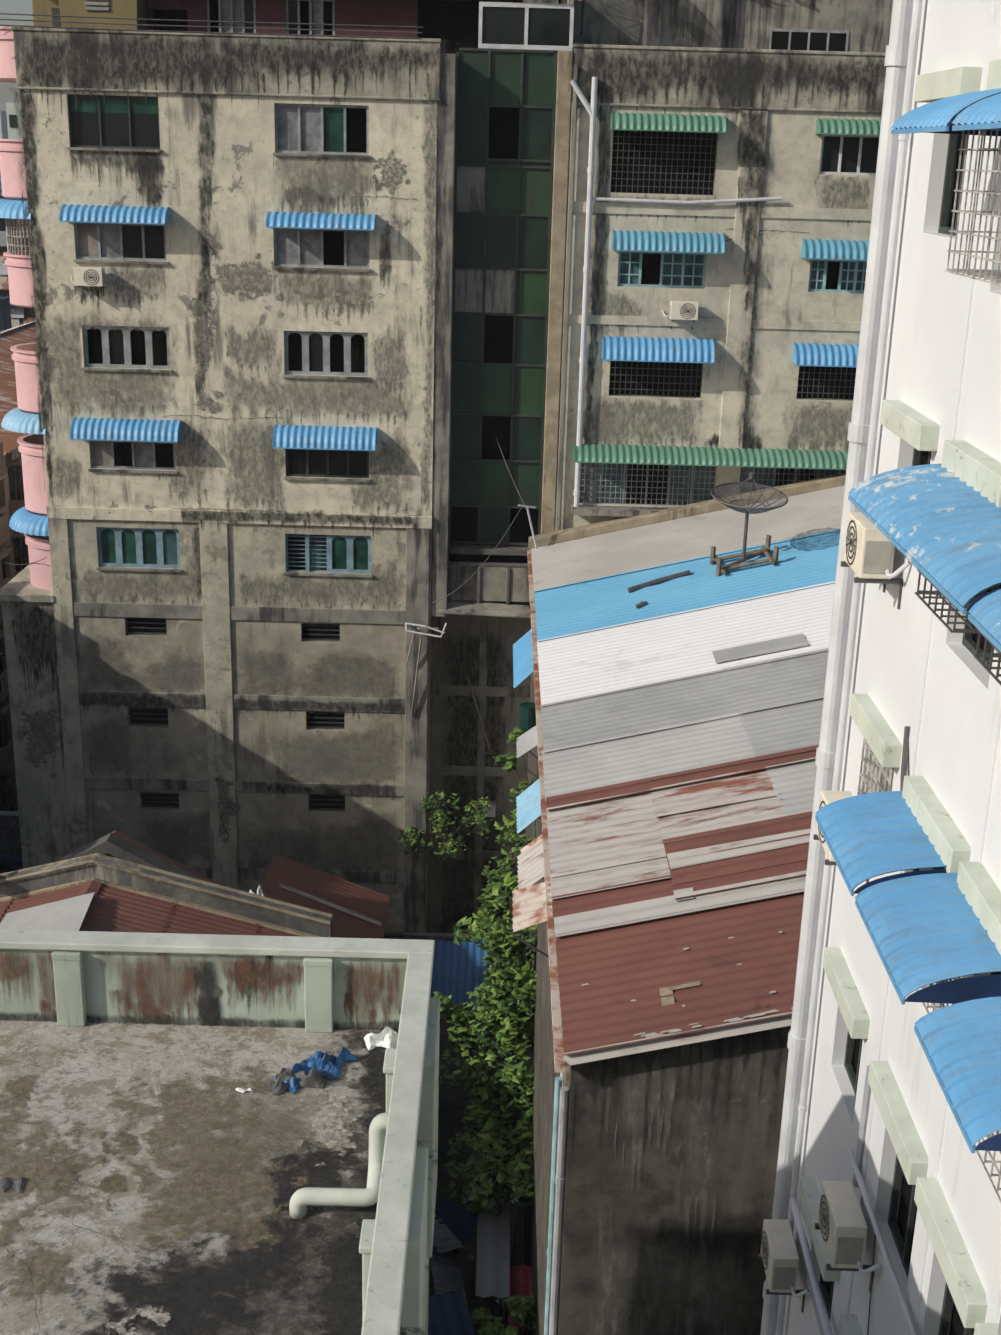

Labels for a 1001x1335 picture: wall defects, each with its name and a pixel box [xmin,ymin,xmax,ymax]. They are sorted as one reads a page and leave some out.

leakage [15,34,449,609]
leakage [577,51,886,451]
leakage [12,603,64,762]
leakage [79,639,206,711]
leakage [233,654,402,802]
corrosion [0,952,57,1021]
leakage [0,1013,57,1022]
corrosion [116,955,205,1024]
corrosion [223,957,303,1008]
corrosion [333,963,401,1029]
leakage [71,1021,400,1335]
leakage [567,1027,784,1335]